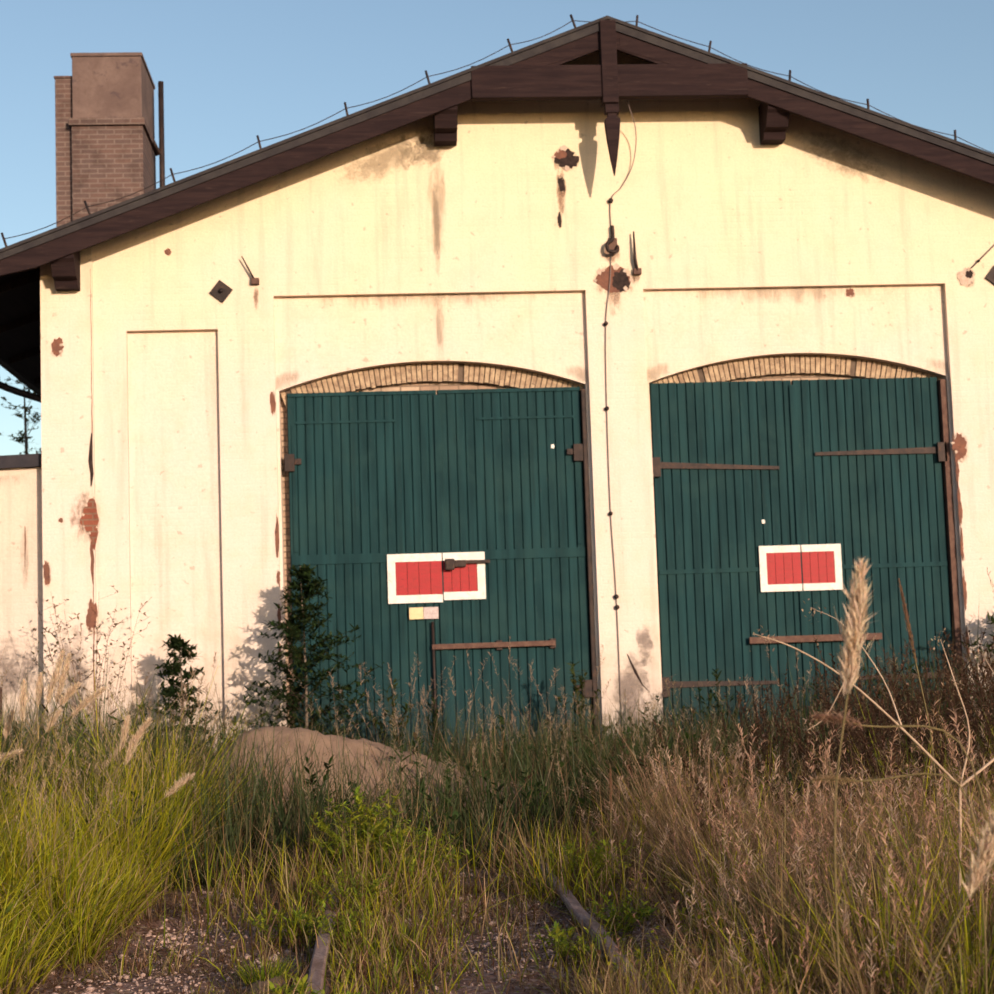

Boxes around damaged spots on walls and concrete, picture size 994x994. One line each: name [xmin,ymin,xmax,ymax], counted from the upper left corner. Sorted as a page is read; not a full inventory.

flaking render [552,145,579,192]
flaking render [594,263,633,299]
flaking render [80,496,99,550]
peeling [951,433,968,609]
flaking render [86,598,98,630]